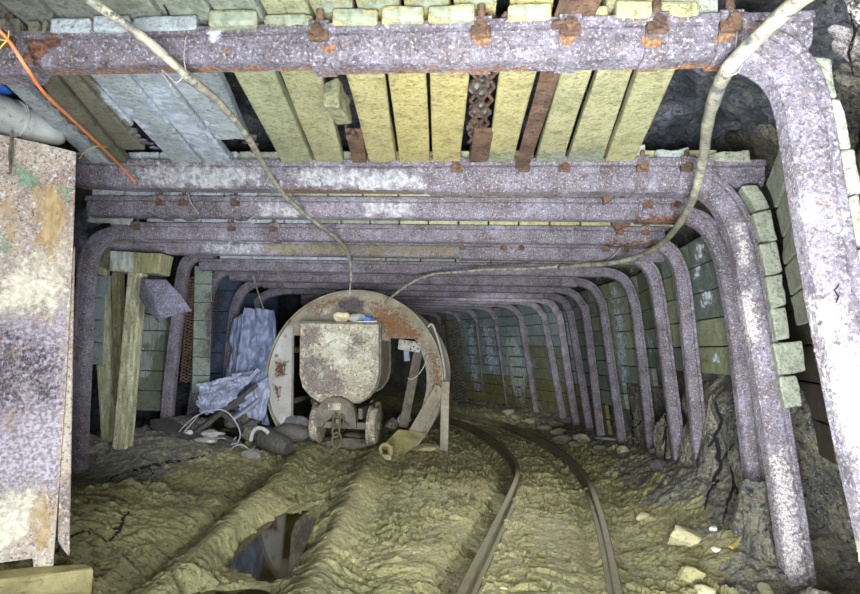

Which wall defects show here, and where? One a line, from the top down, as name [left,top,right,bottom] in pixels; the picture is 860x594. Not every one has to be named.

rust [559,35,575,45]
rust [642,36,661,48]
rust [634,63,718,72]
crack [704,401,739,522]